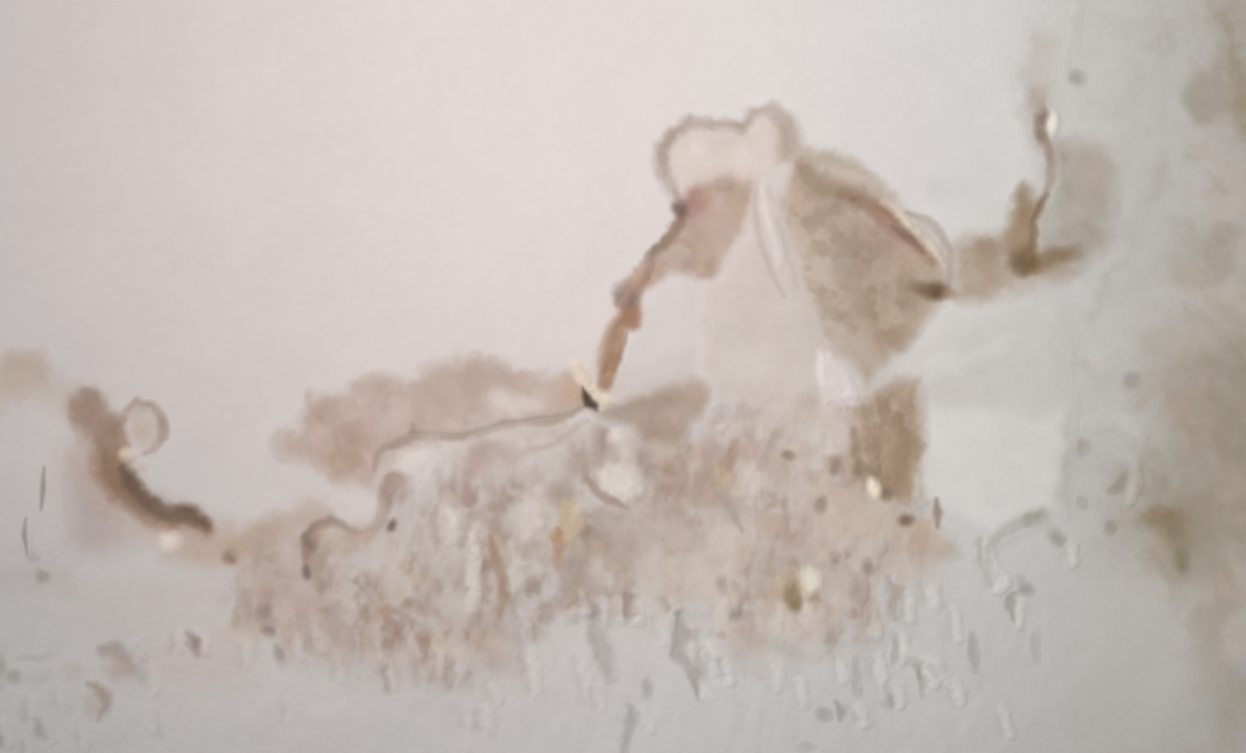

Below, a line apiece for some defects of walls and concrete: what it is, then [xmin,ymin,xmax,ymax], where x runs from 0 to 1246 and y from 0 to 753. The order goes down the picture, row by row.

leakage [917,0,1246,753]
peeling [4,636,166,741]
peeling [167,626,214,659]
leakage [26,347,953,710]
peeling [561,585,738,753]
spalling [773,564,825,616]